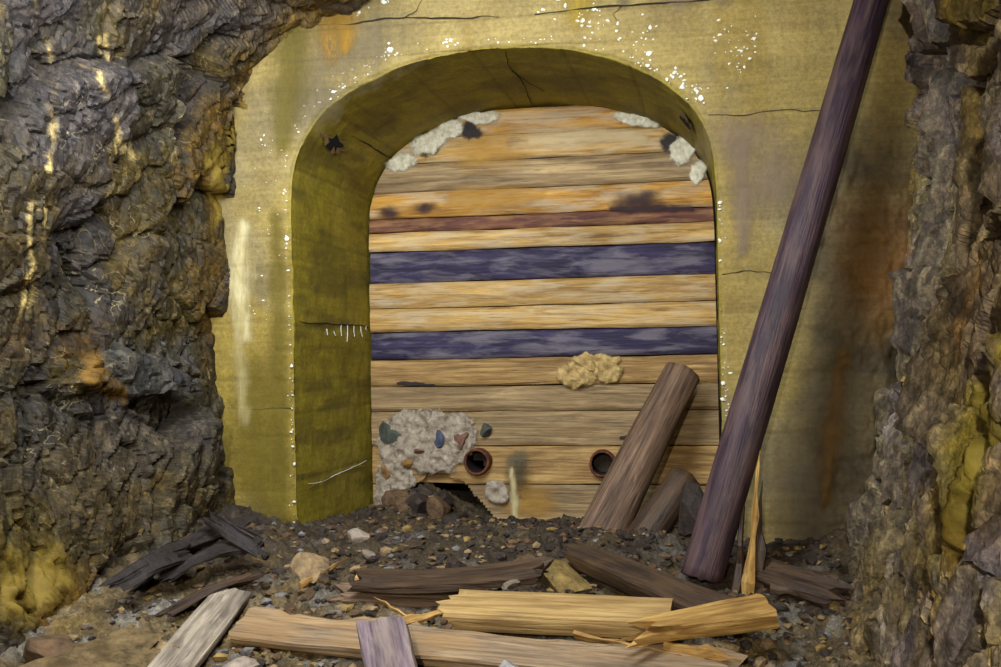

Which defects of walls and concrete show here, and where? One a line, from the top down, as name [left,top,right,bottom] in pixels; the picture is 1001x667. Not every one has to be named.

crack [317,0,494,25]
crack [535,0,708,22]
water stain [556,0,658,71]
water stain [713,19,757,73]
water stain [666,66,709,104]